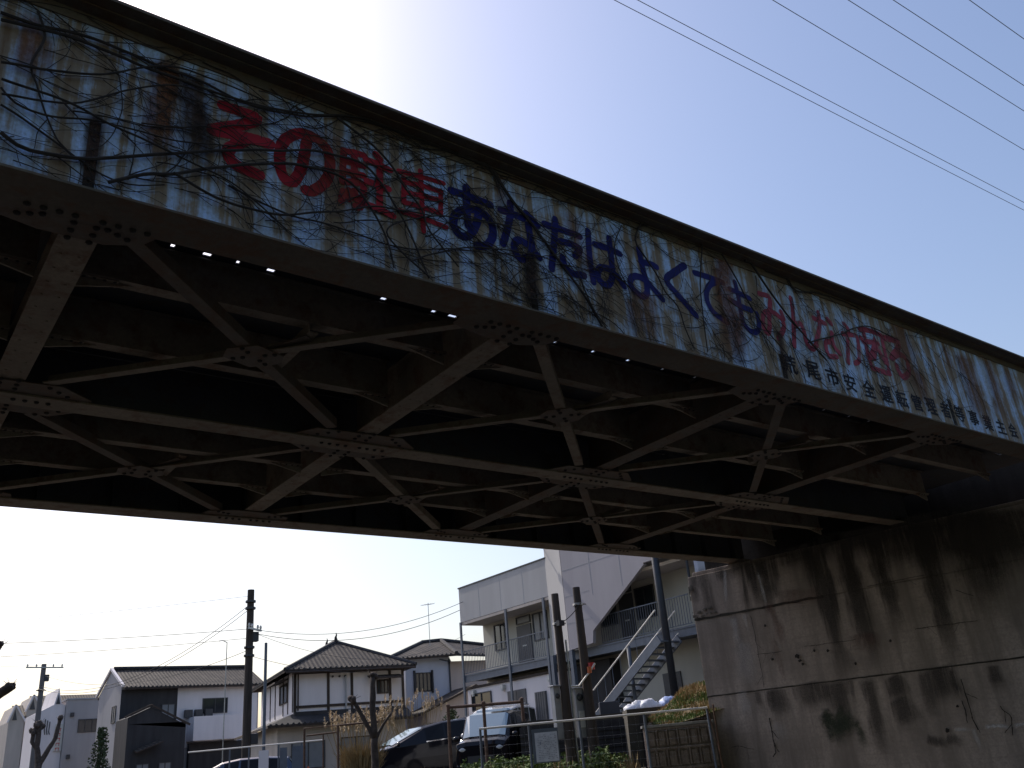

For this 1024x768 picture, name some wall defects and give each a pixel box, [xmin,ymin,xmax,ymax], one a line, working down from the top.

rust [83,117,103,181]
water stain [715,510,1024,647]
water stain [800,675,912,739]
crack [960,679,980,732]